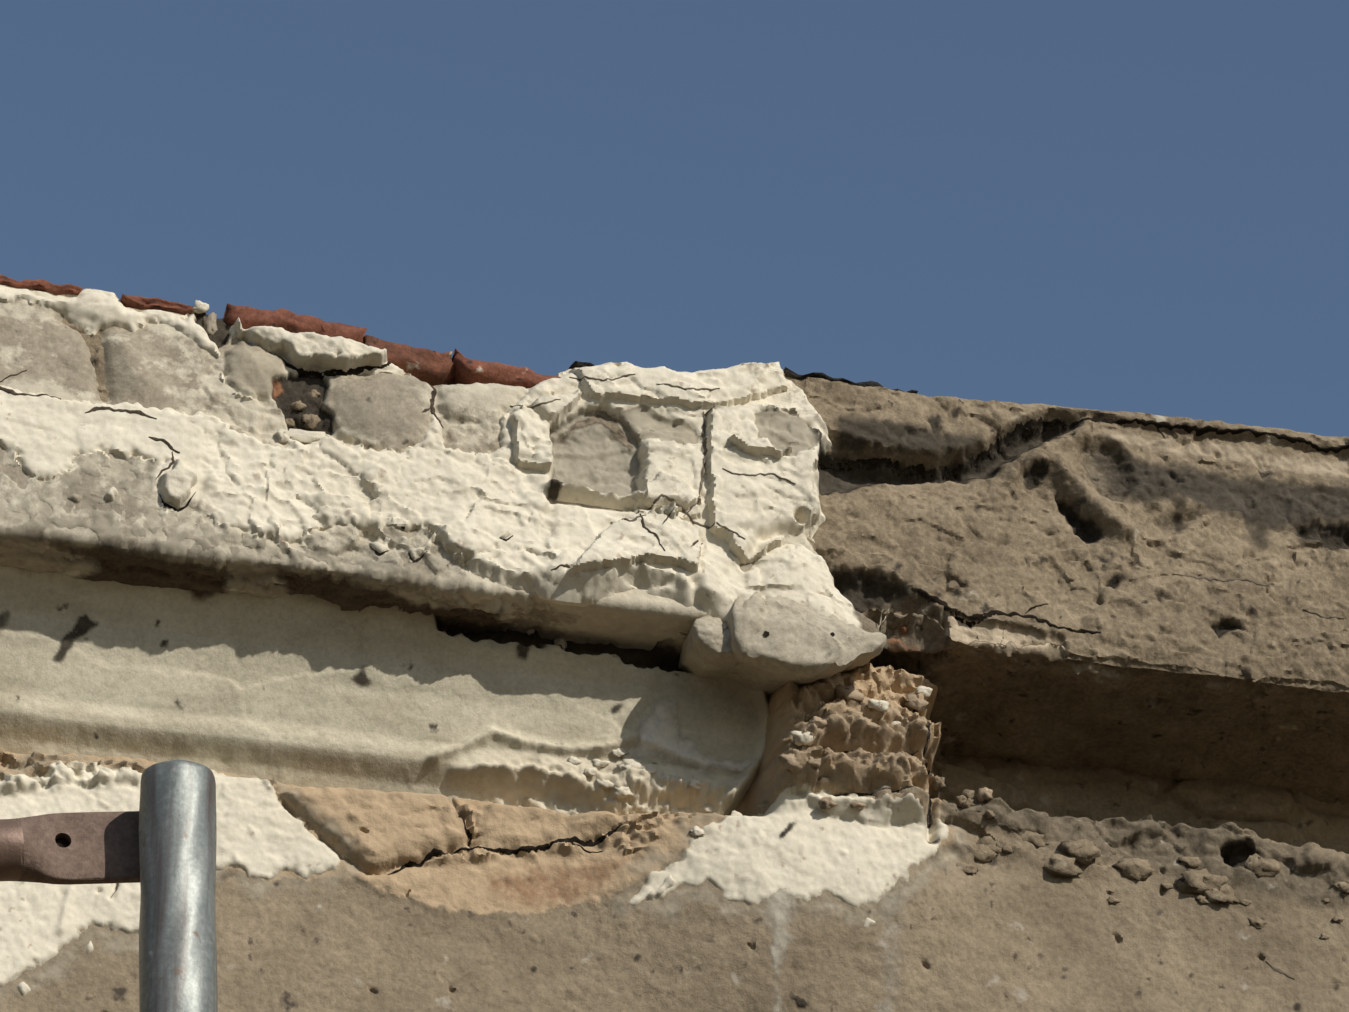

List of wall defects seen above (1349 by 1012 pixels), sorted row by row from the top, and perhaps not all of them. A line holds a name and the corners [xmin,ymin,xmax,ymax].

crack [0,370,180,479]
spalling [272,373,332,443]
crack [510,374,1349,551]
crack [911,588,1101,639]
spalling [778,716,828,774]
spalling [757,803,770,815]
spalling [818,797,866,811]
crack [388,816,622,875]
peeling [644,874,675,900]
spalling [930,775,1349,940]